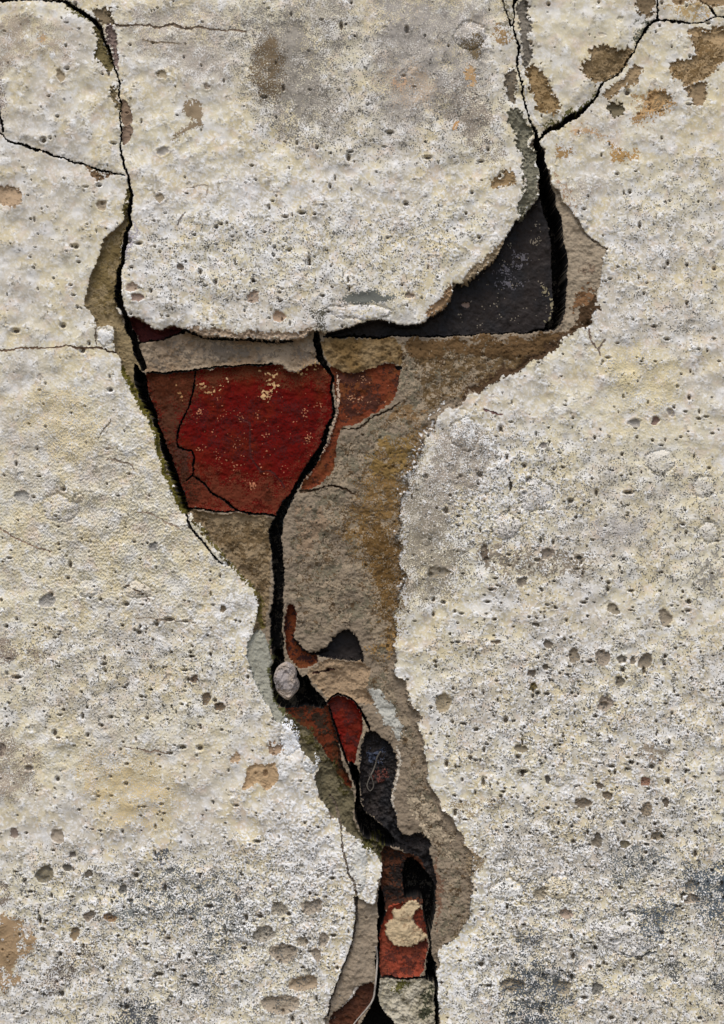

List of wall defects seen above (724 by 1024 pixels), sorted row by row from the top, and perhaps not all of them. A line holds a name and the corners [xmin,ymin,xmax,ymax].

crack [626,0,724,62]
spalling [84,189,179,487]
crack [0,0,624,847]
spalling [166,0,614,977]
hole [70,911,117,941]
hole [260,975,318,1015]
spalling [323,878,387,1024]
hole [499,978,526,993]